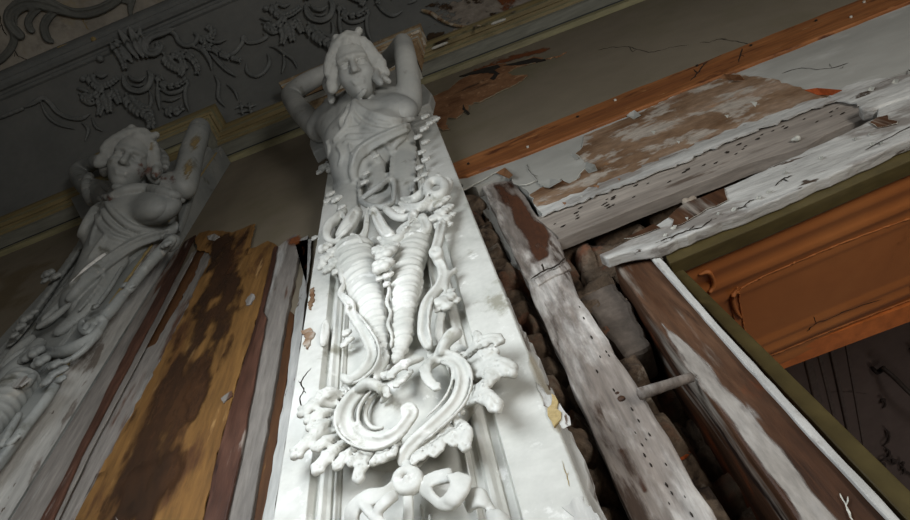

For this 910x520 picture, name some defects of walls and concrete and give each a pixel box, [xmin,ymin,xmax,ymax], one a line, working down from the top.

flaking render [421,0,531,50]
flaking render [433,56,546,131]
flaking render [462,73,910,261]
spalling [499,279,607,520]